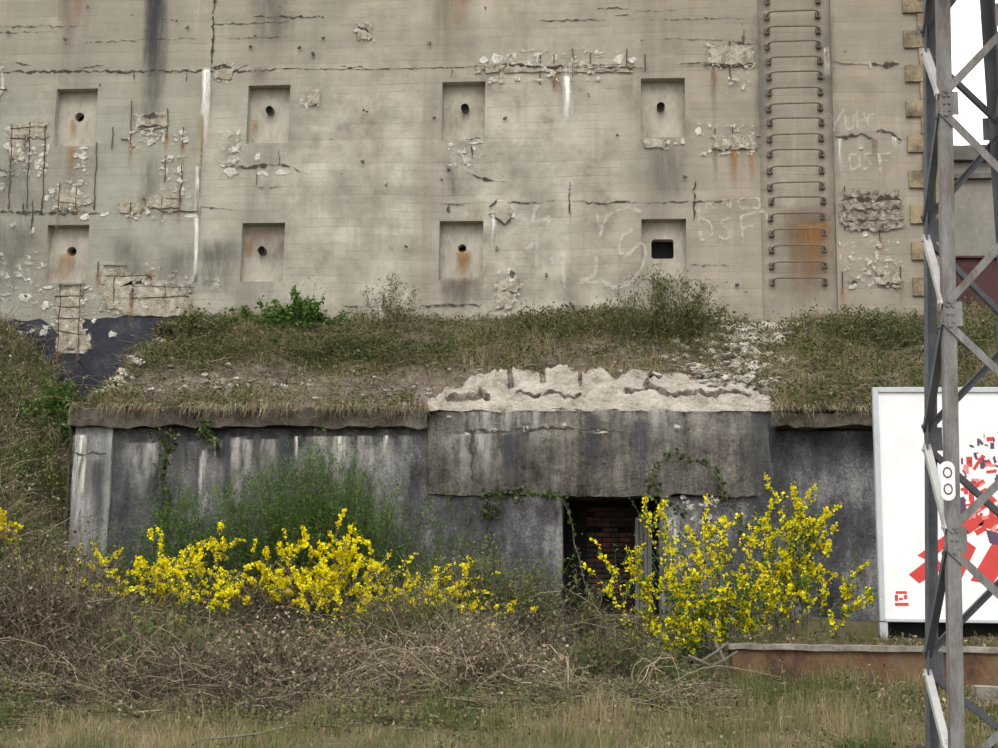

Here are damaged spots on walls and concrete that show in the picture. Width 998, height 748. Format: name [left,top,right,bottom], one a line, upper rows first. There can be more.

water stain [148,0,164,60]
crack [0,0,476,83]
spalling [474,46,648,87]
spalling [679,35,756,94]
spalling [0,121,97,217]
spalling [111,100,200,222]
spalling [640,122,761,165]
spalling [838,186,905,294]
peeling [0,251,220,403]
spalling [426,364,771,420]
water stain [75,435,102,514]
water stain [214,435,260,481]